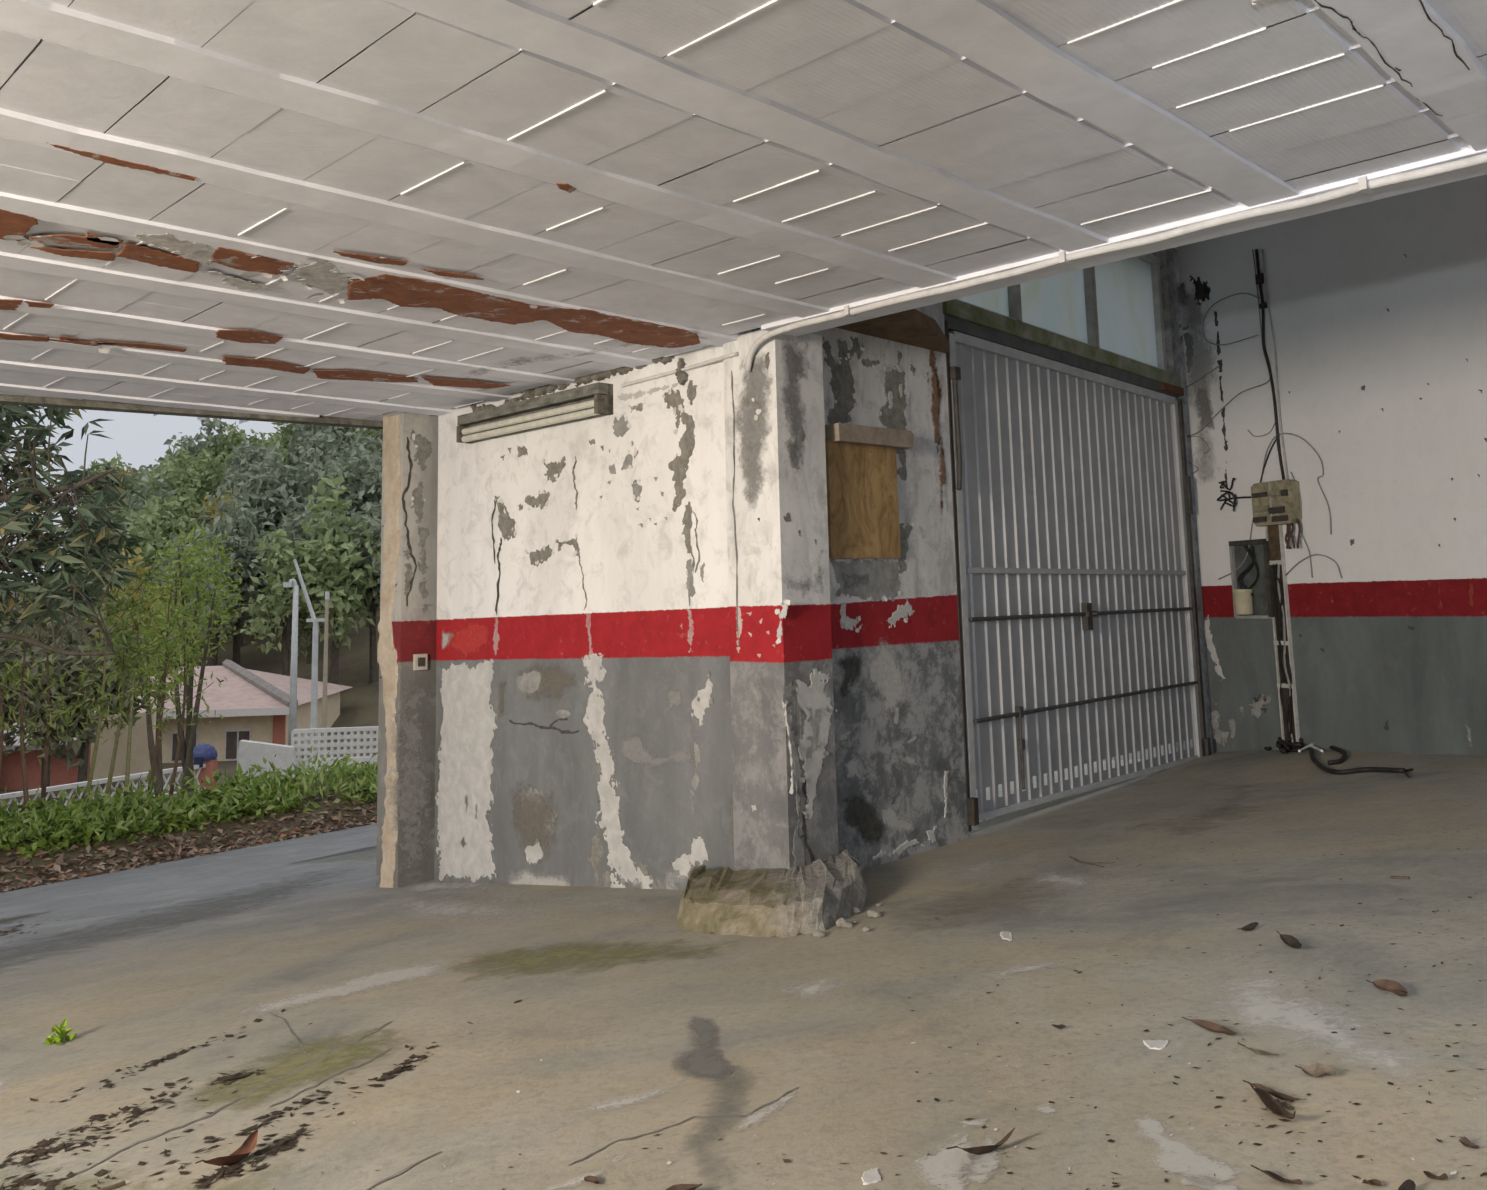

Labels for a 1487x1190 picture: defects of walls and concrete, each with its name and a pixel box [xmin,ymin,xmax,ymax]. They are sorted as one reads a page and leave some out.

peeling [46,142,196,181]
peeling [556,183,576,193]
peeling [0,209,708,653]
peeling [743,397,762,422]
peeling [823,336,946,486]
peeling [830,523,915,632]
peeling [435,618,500,882]
crack [509,718,579,734]
spalling [582,613,653,889]
peeling [690,672,713,814]
spalling [671,836,709,877]
leakage [573,1017,796,1145]